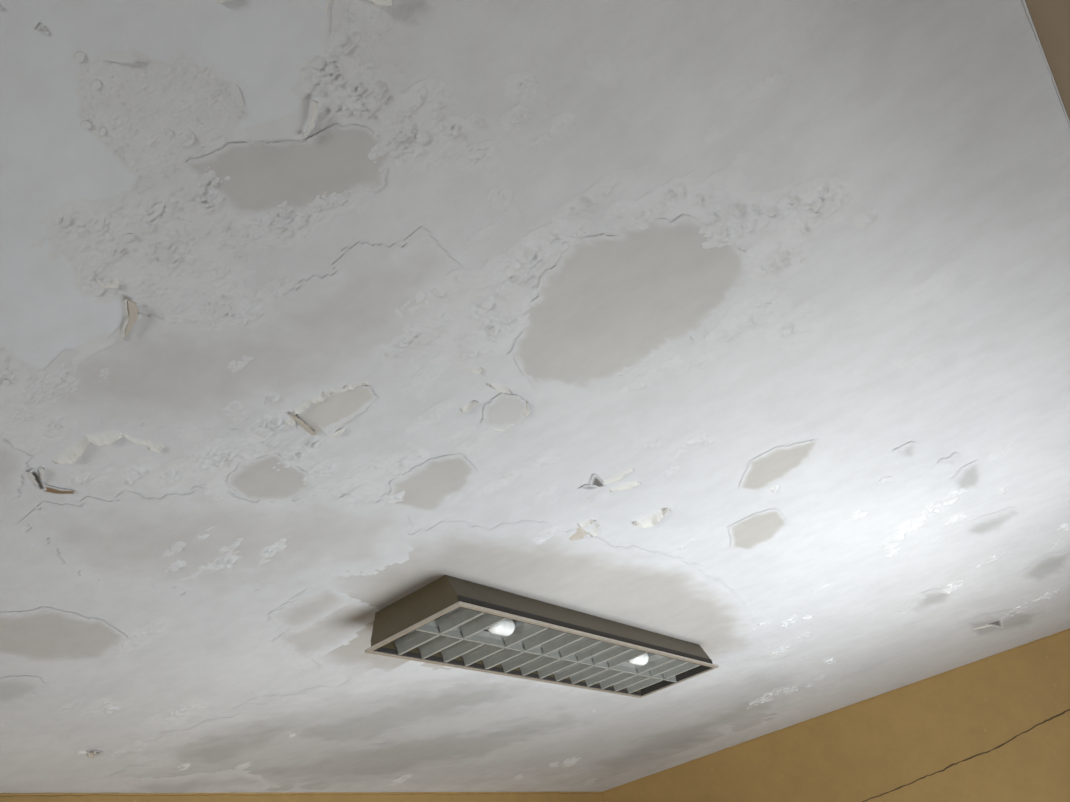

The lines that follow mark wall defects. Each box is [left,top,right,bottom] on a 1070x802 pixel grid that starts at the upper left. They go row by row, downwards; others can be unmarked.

flaking render [186,98,394,216]
damp [23,227,463,437]
peeling [286,382,377,437]
flaking render [226,453,313,502]
damp [21,486,829,793]
crack [860,708,1070,802]